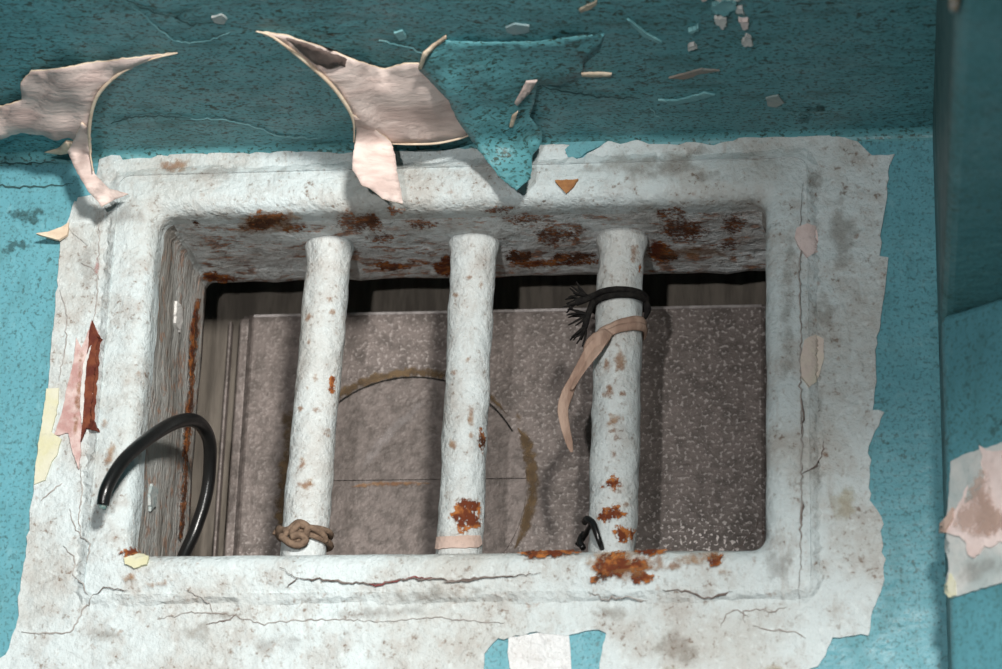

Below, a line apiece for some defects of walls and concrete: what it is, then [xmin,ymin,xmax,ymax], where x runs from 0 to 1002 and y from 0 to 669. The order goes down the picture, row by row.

spalling [702,0,753,47]
peeling [0,31,612,207]
corrosion [238,209,308,233]
corrosion [373,256,450,277]
corrosion [485,206,599,269]
peeling [0,135,895,669]
crack [24,469,127,634]
crack [157,589,503,626]
crack [279,567,541,587]
corrosion [448,498,481,534]
corrosion [590,505,723,584]
spalling [939,442,1002,599]